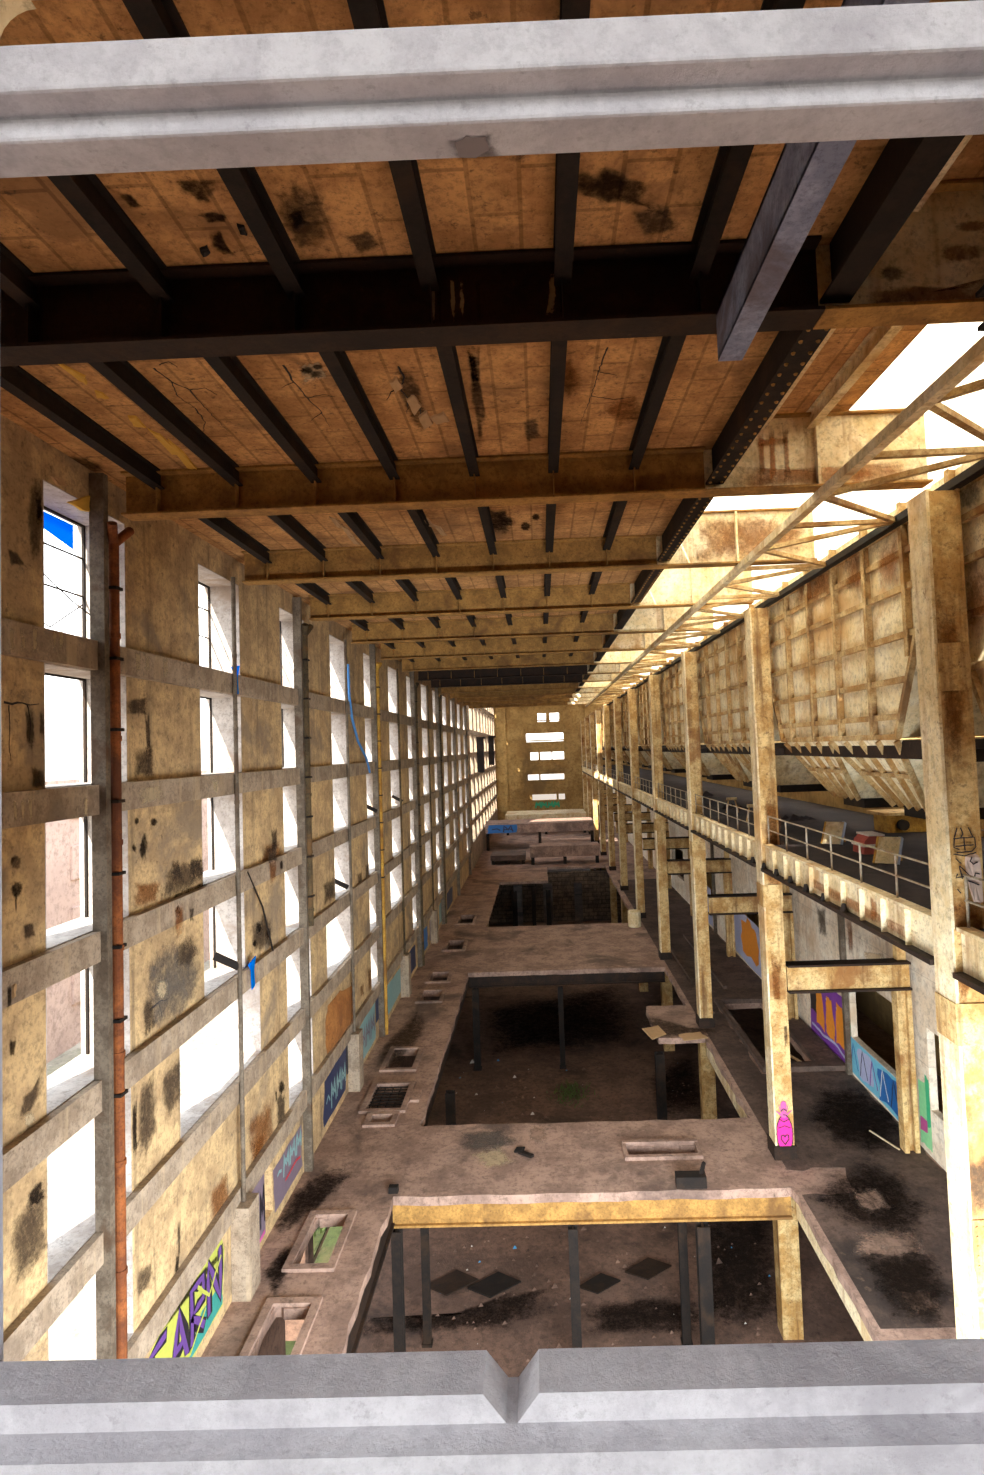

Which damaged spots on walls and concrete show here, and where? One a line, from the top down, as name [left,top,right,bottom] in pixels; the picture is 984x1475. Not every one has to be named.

peeling [455,136,493,158]
water stain [280,186,329,247]
water stain [349,233,378,252]
water stain [578,170,675,234]
crack [153,361,227,432]
spalling [387,366,450,429]
water stain [128,698,160,858]
water stain [144,938,198,1034]